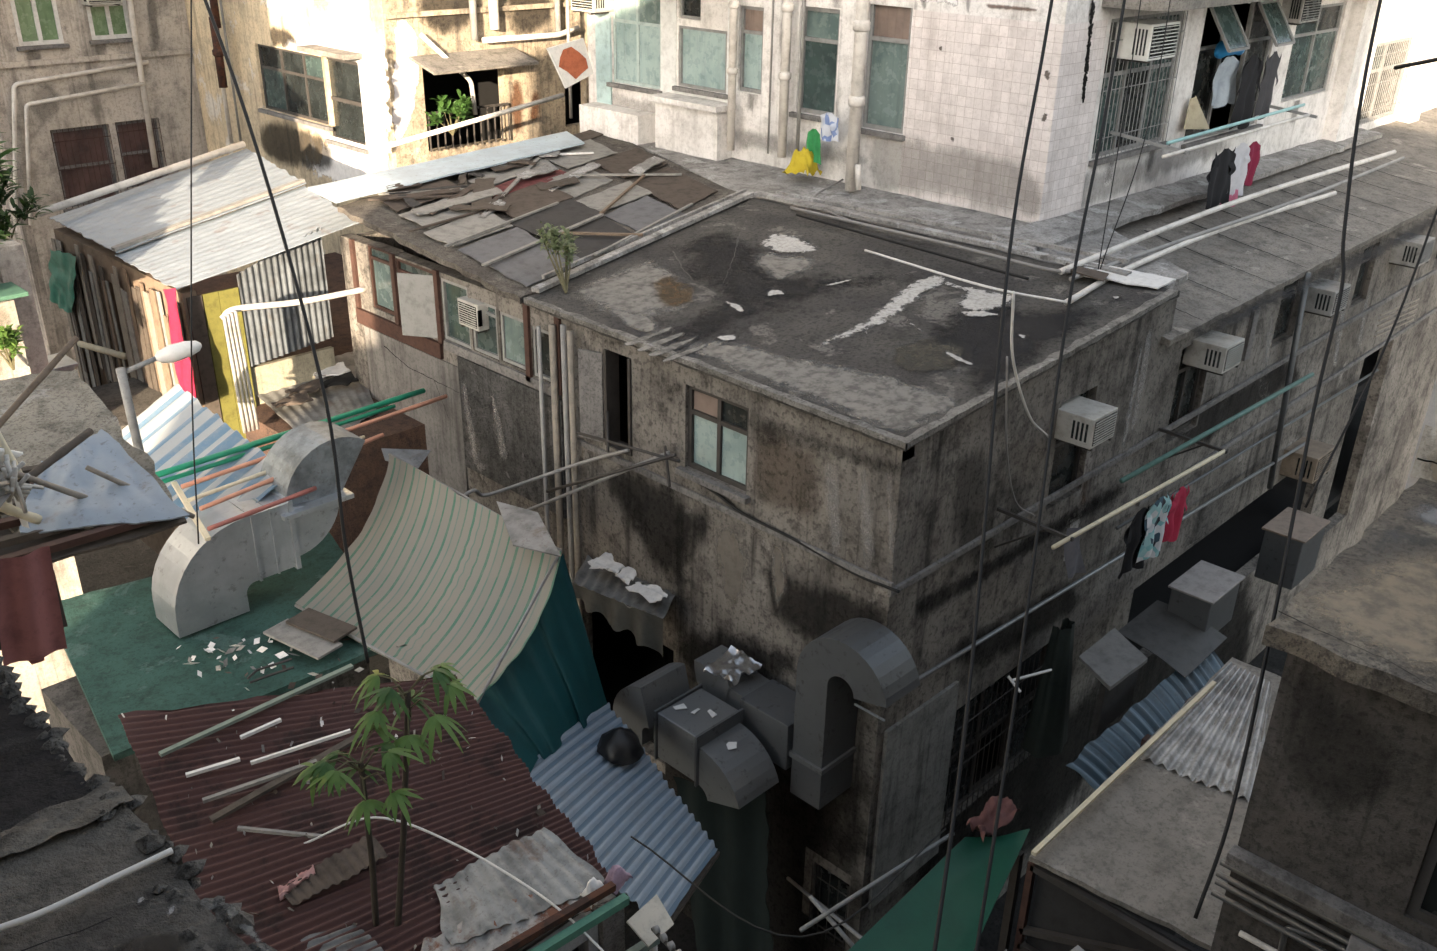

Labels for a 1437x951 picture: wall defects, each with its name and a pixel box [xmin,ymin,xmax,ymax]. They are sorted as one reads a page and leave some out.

peeling [284,19,419,182]
leakage [817,276,1094,389]
leakage [609,473,748,603]
leakage [770,545,883,638]